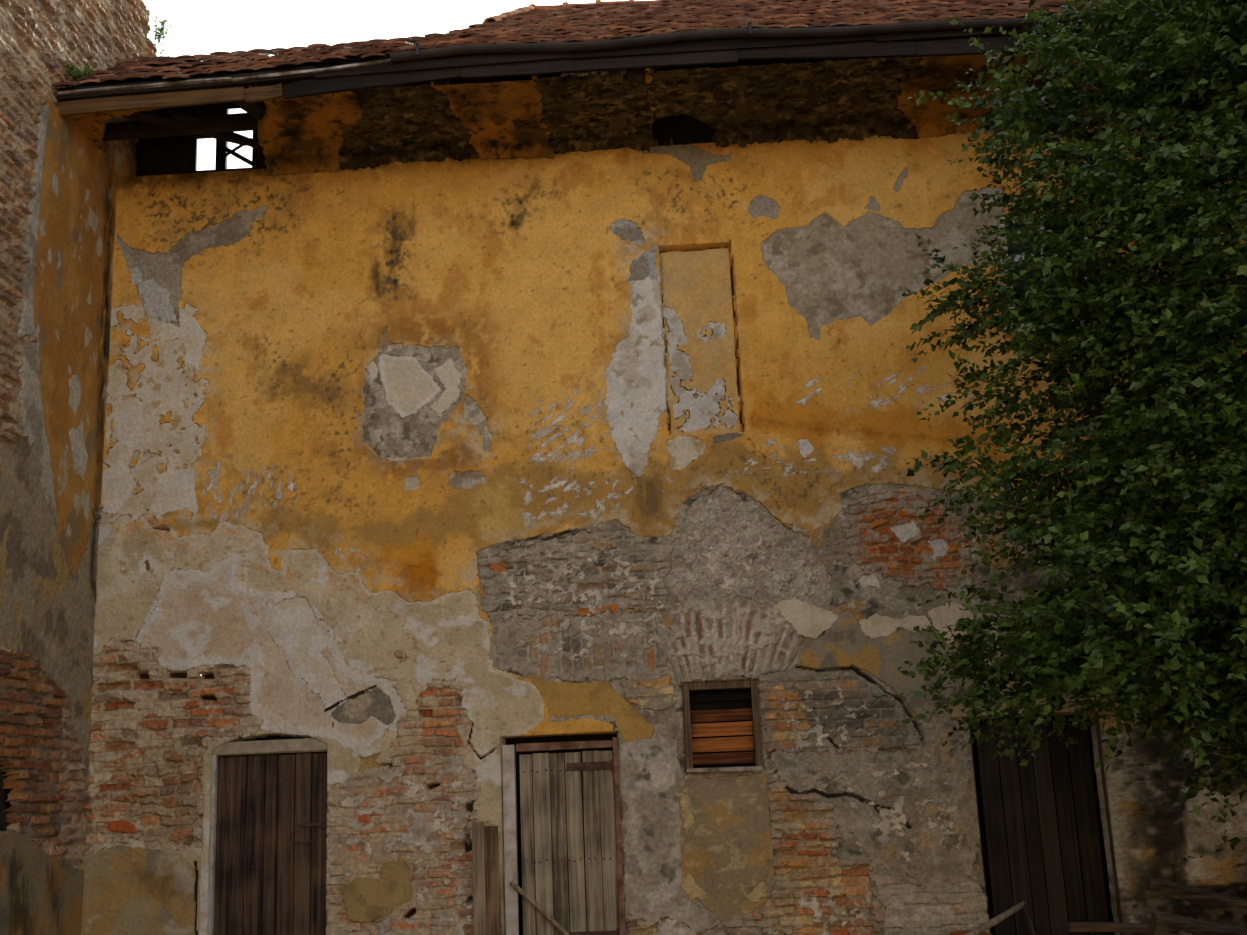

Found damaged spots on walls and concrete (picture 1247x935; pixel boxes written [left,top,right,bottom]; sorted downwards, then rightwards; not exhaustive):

spalling [338,79,480,171]
spalling [531,57,924,182]
spalling [984,51,1062,131]
peeling [0,100,1103,935]
crack [324,685,377,712]
crack [805,707,839,749]
crack [796,667,922,741]
spalling [1045,656,1247,935]